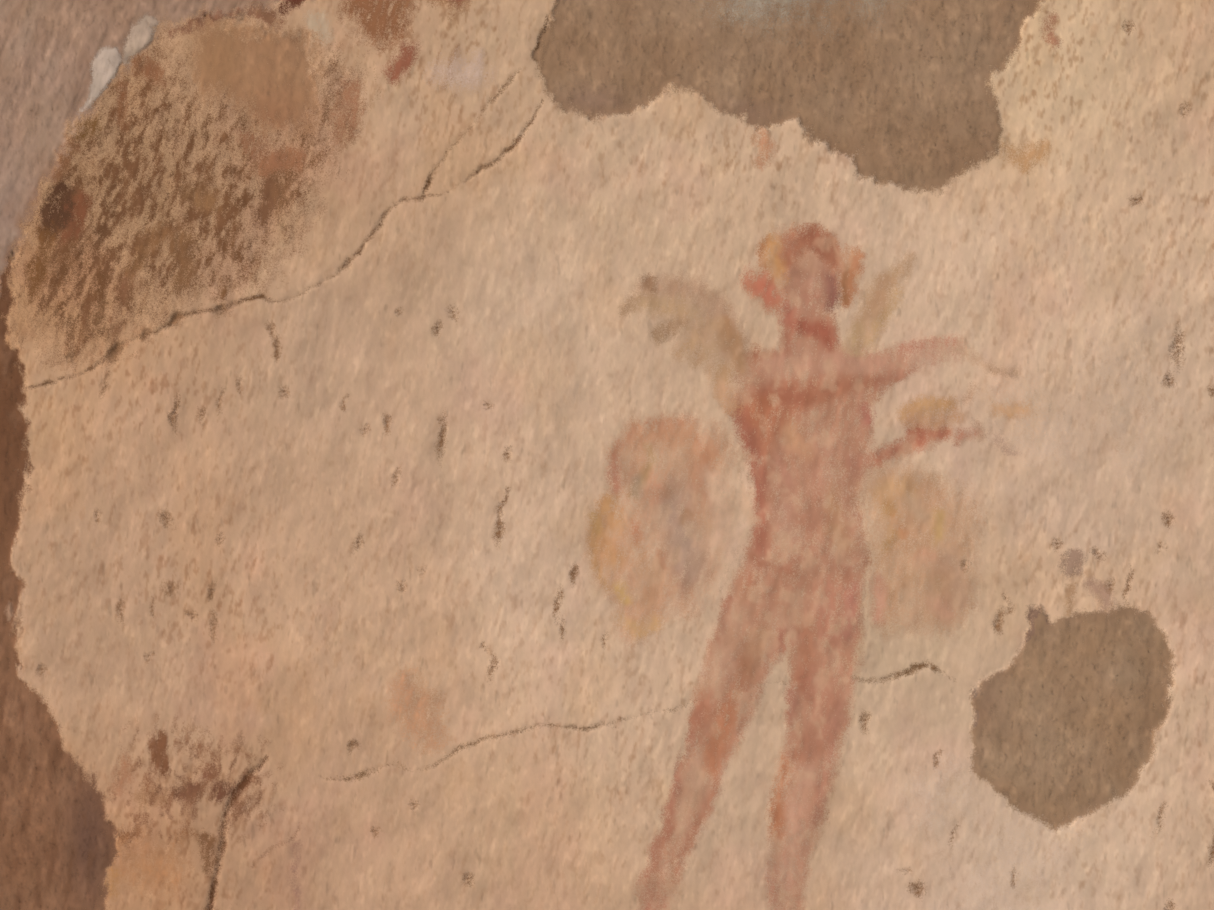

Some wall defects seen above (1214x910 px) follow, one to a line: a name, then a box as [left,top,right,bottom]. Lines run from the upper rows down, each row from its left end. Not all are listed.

damp [0,0,500,375]
crack [28,14,550,390]
spalling [0,0,286,910]
crack [326,700,697,783]
crack [827,659,956,685]
spalling [991,595,1015,635]
crack [203,756,302,910]